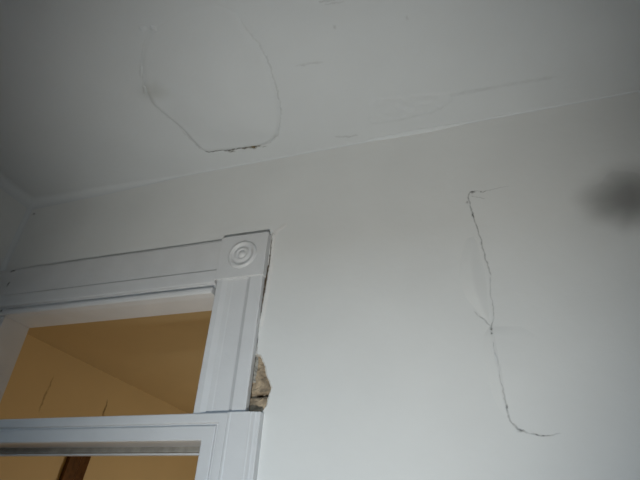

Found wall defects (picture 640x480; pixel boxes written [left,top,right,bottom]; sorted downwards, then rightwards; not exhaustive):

flaking render [249,354,272,413]